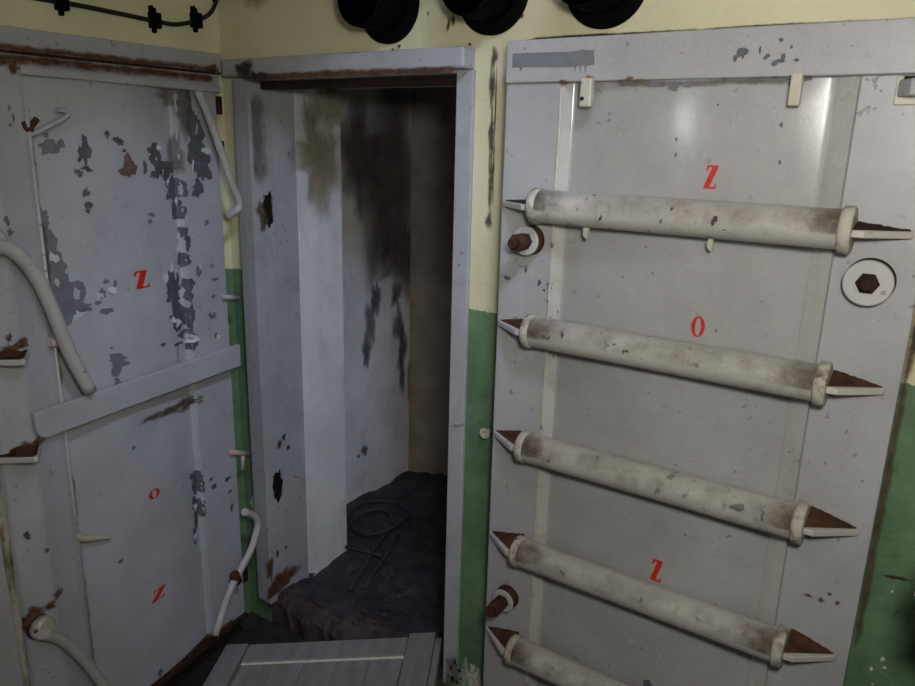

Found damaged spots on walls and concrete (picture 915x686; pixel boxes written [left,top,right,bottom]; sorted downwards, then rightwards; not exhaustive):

corrosion [0,44,219,82]
peeling [38,132,66,155]
peeling [74,134,93,177]
corrosion [485,68,497,226]
peeling [83,188,93,214]
peeling [104,90,219,361]
peeling [40,210,117,326]
water stain [363,286,380,365]
water stain [393,284,406,387]
corrosion [144,396,201,422]
corrosion [267,558,297,598]